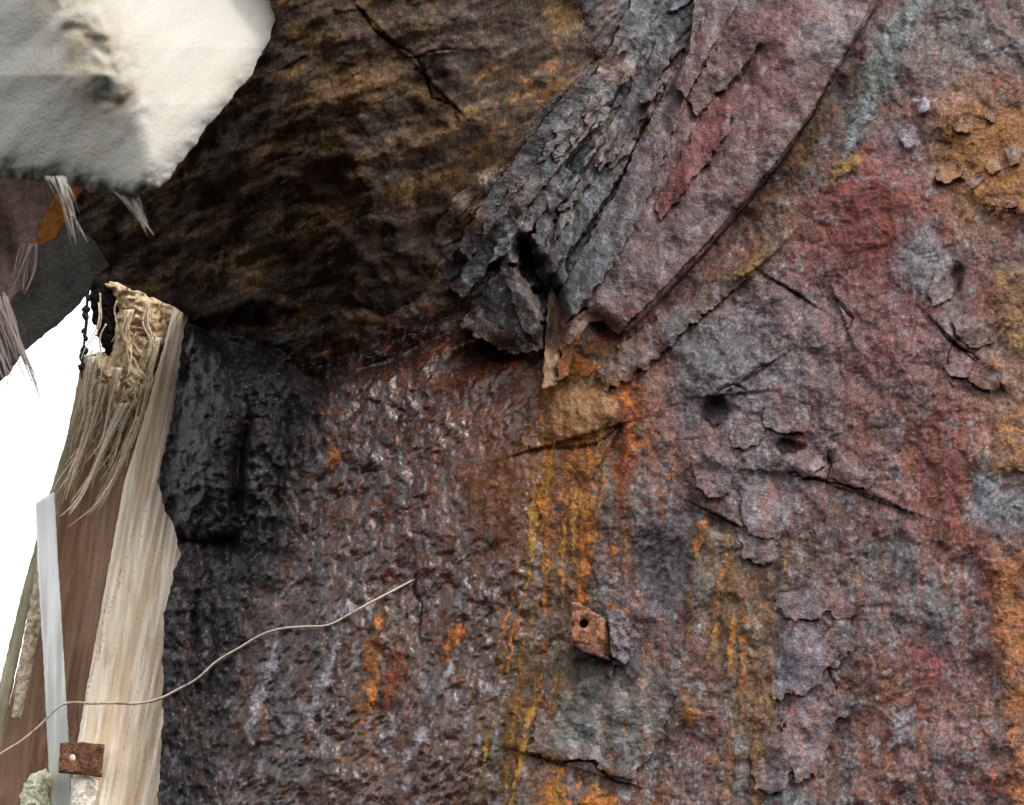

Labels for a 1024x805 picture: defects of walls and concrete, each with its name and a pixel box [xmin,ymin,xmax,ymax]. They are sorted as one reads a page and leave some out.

crack [367,15,462,105]
peeling [655,20,771,220]
corrosion [935,96,1024,216]
peeling [595,266,749,392]
crack [704,509,738,528]
crack [713,364,767,396]
peeling [690,396,876,566]
crack [789,456,897,507]
corrosion [983,258,1024,352]
corrosion [990,395,1024,472]
corrosion [460,374,647,805]
peeling [751,579,867,795]